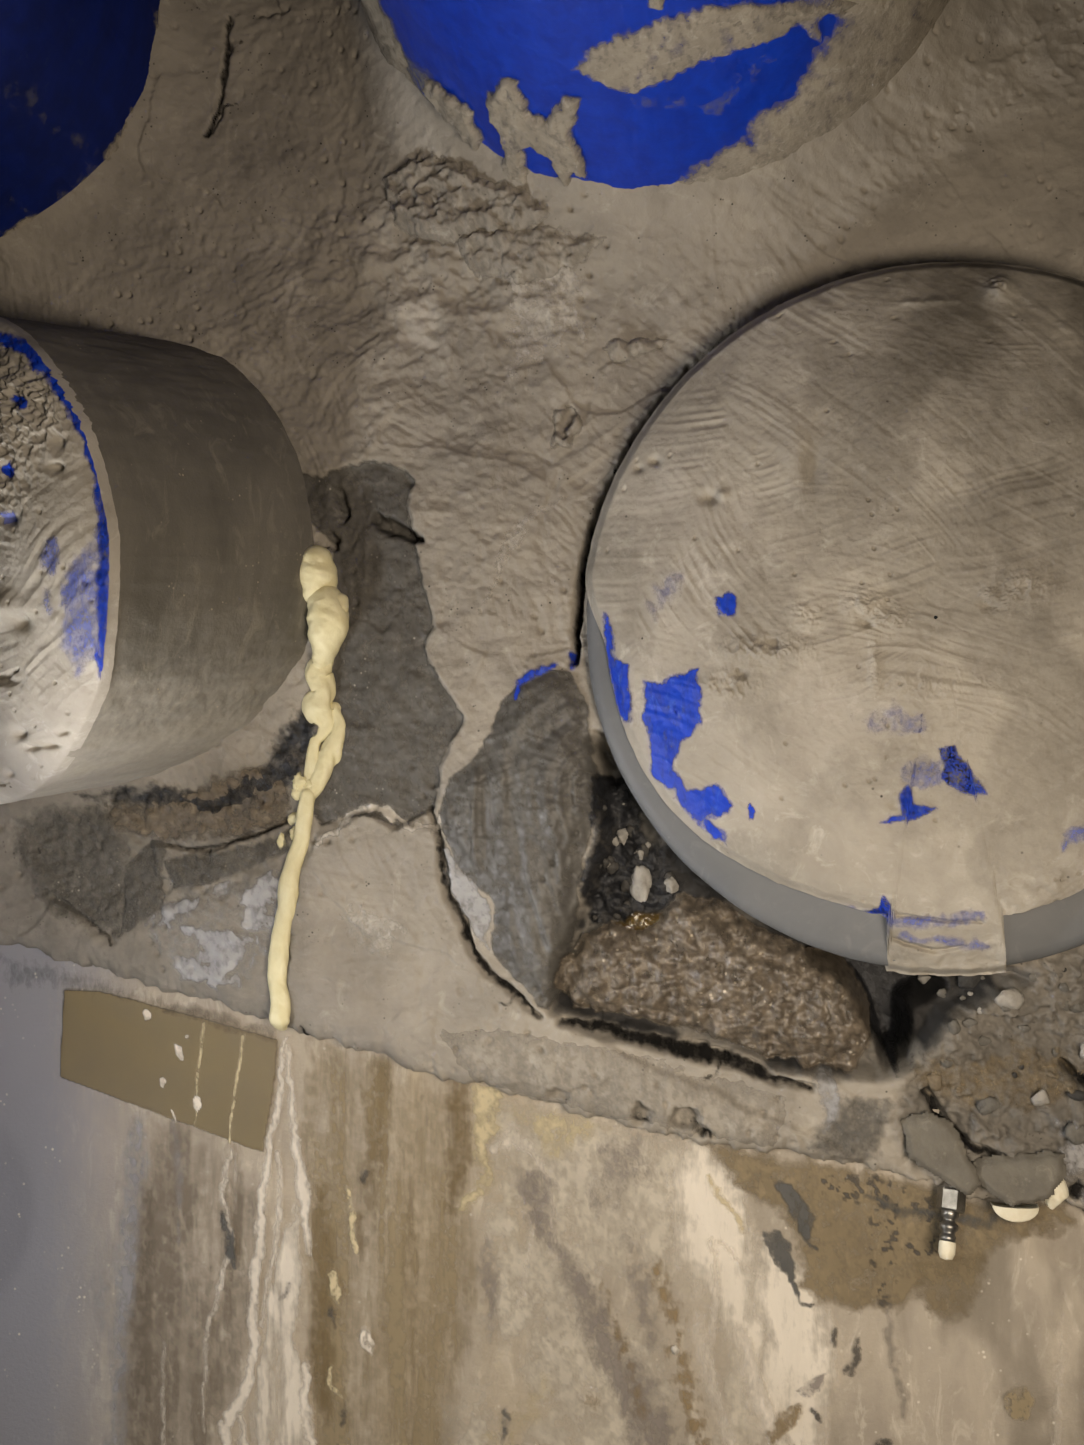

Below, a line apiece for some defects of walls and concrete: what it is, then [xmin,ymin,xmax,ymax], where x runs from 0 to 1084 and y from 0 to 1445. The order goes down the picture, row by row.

crack [205,17,242,138]
crack [575,532,594,658]
spalling [19,711,317,988]
crack [169,821,288,854]
damp [113,461,1076,1445]
spalling [554,775,1037,1072]
spalling [1030,1089,1050,1106]
spalling [1067,1043,1084,1101]
peeling [973,1122,1084,1206]